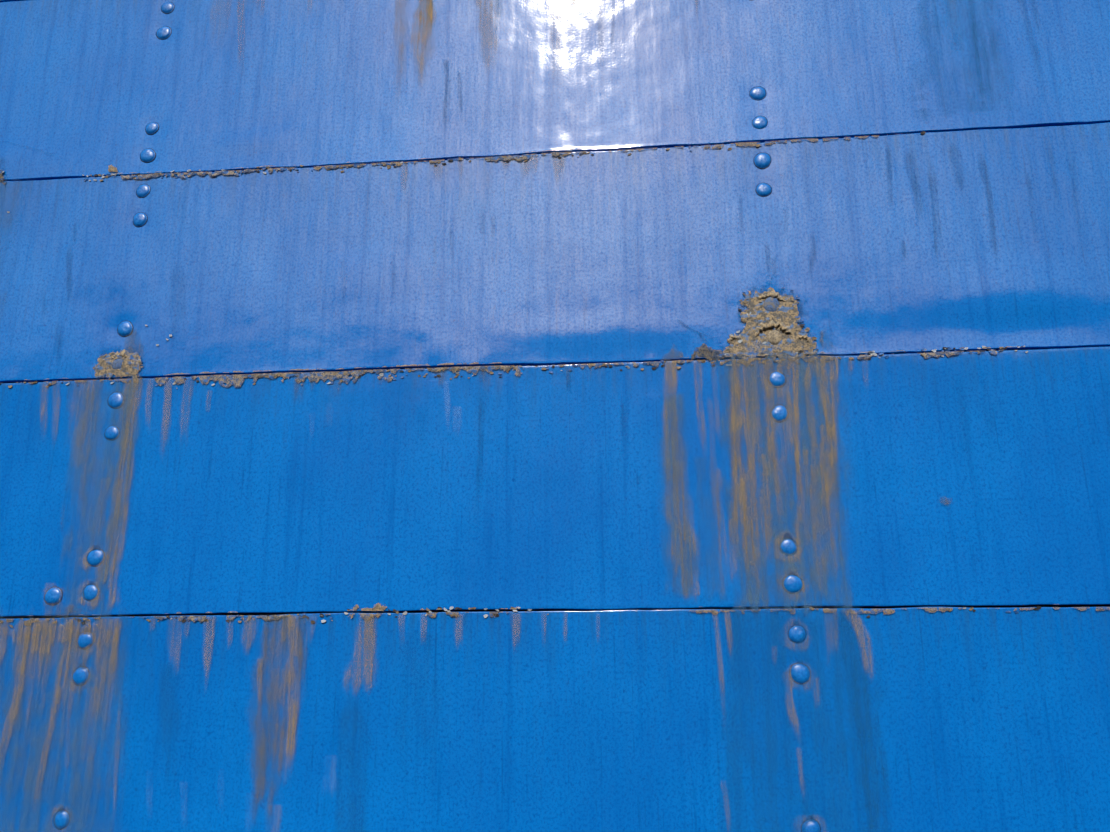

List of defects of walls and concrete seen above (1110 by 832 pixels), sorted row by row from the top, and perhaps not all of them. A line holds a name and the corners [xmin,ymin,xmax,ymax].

rust [95,380,139,603]
rust [722,356,844,611]
rust [256,616,298,797]